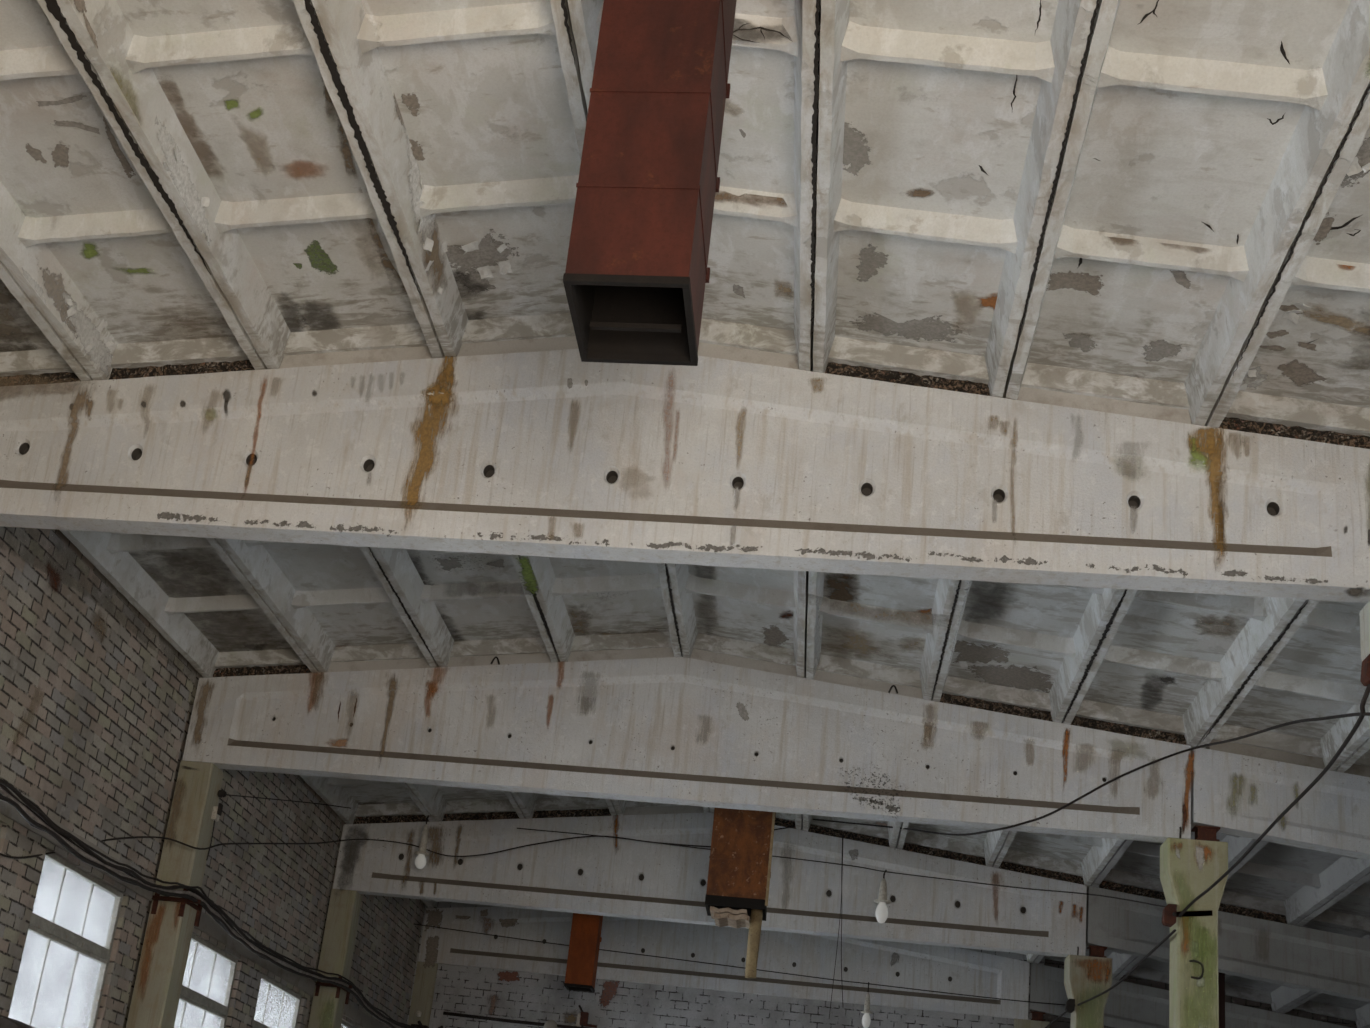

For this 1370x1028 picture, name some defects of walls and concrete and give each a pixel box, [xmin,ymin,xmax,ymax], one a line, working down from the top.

crack [1137,0,1159,25]
peeling [112,72,138,118]
peeling [1341,137,1370,188]
peeling [856,244,889,282]
peeling [849,312,963,342]
peeling [1238,302,1326,392]
corrosion [55,390,93,491]
corrosion [245,381,266,488]
corrosion [402,356,455,521]
corrosion [1189,428,1226,562]
corrosion [1062,730,1070,782]
corrosion [1173,751,1195,849]